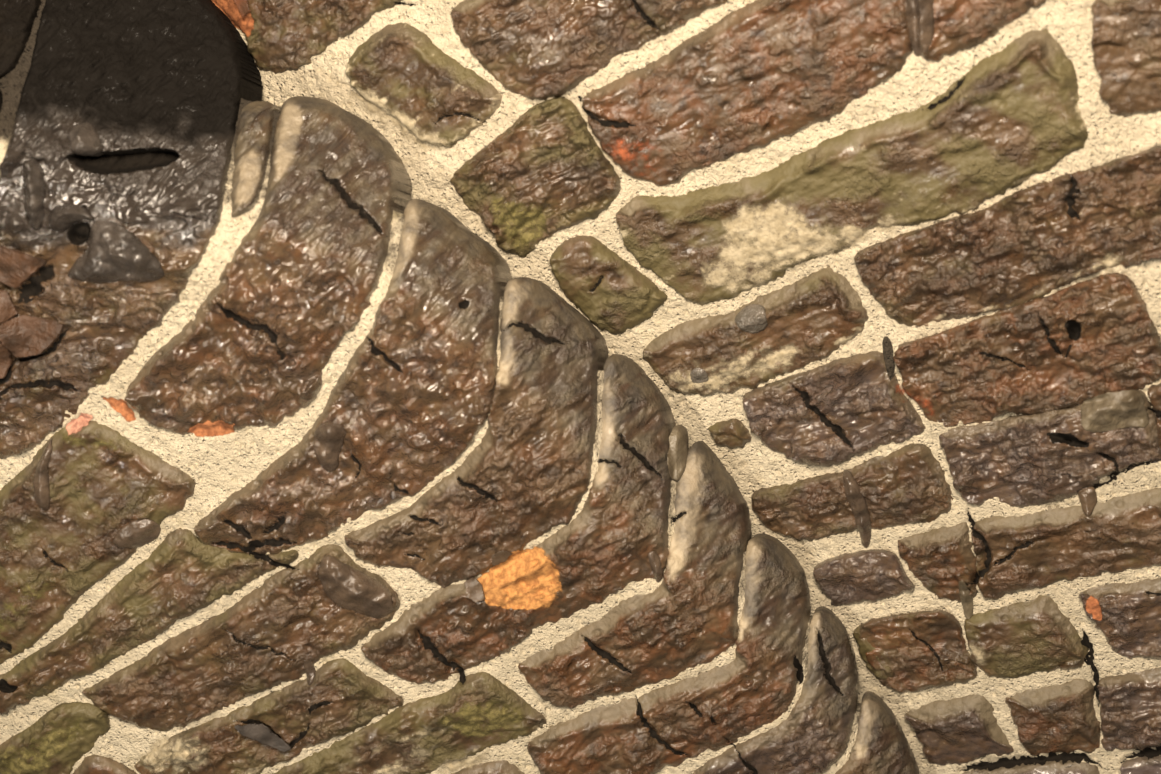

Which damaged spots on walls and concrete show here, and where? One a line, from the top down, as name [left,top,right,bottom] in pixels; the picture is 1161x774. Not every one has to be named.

crack [18,264,55,304]
crack [0,328,81,399]
crack [793,386,854,451]
crack [581,635,687,756]